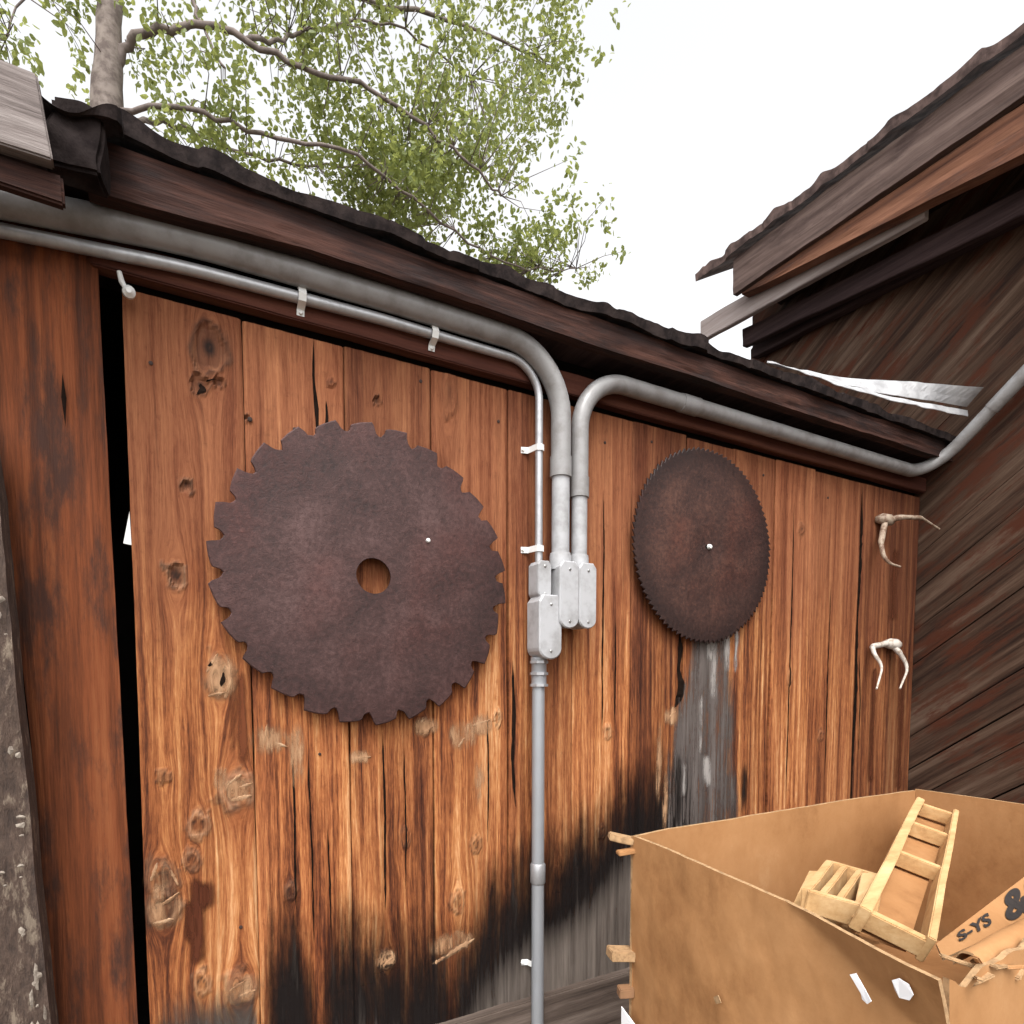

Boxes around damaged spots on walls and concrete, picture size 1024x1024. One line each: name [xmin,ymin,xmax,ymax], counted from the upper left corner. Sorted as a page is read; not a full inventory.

crack [312,342,329,427]
water stain [163,631,747,1024]
crack [487,667,516,841]
crack [674,634,685,708]